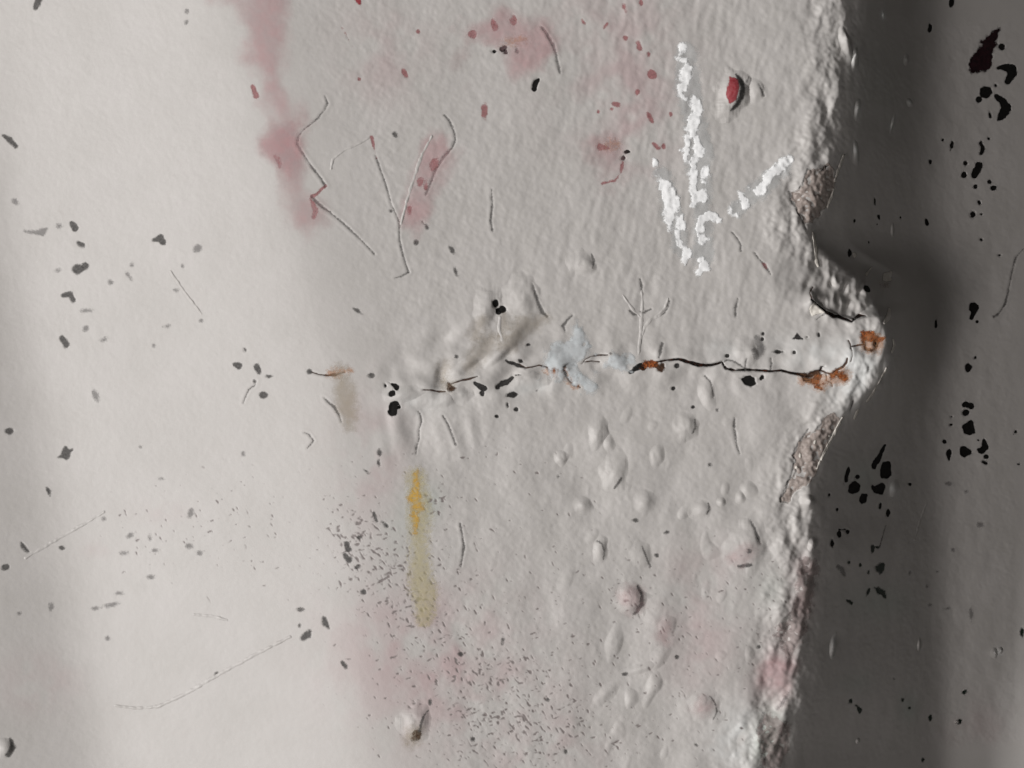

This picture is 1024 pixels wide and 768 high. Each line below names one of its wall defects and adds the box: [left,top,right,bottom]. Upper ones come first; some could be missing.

spalling [789,154,845,267]
crack [520,354,606,388]
corrosion [629,360,665,374]
crack [657,287,865,384]
corrosion [801,370,848,390]
corrosion [860,330,885,352]
spalling [780,367,888,503]
peeling [844,444,892,517]